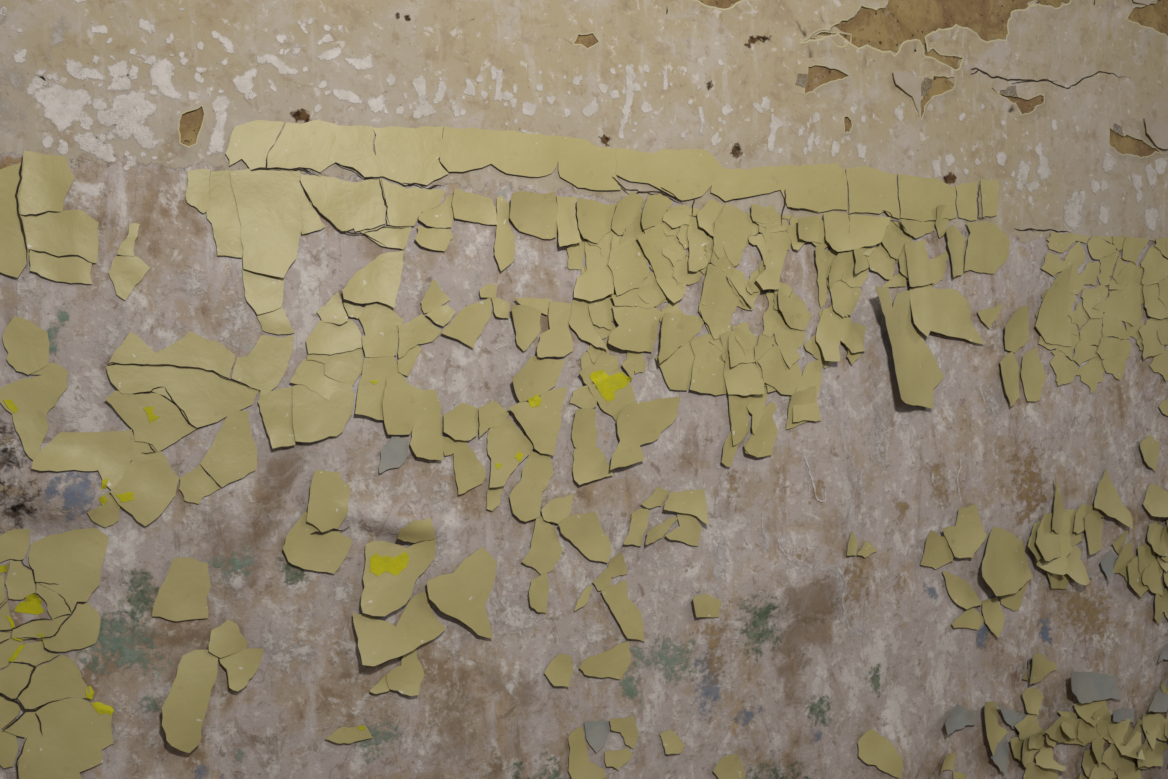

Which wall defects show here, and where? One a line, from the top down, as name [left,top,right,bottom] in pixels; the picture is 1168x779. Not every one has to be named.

flaking render [563,23,609,61]
flaking render [602,0,777,30]
flaking render [784,0,1168,142]
flaking render [1099,116,1168,168]
water stain [0,421,100,529]
peeling [0,95,1011,779]
peeling [920,435,1168,638]
crack [0,560,86,779]
water stain [260,625,316,674]
peeling [945,651,1168,779]